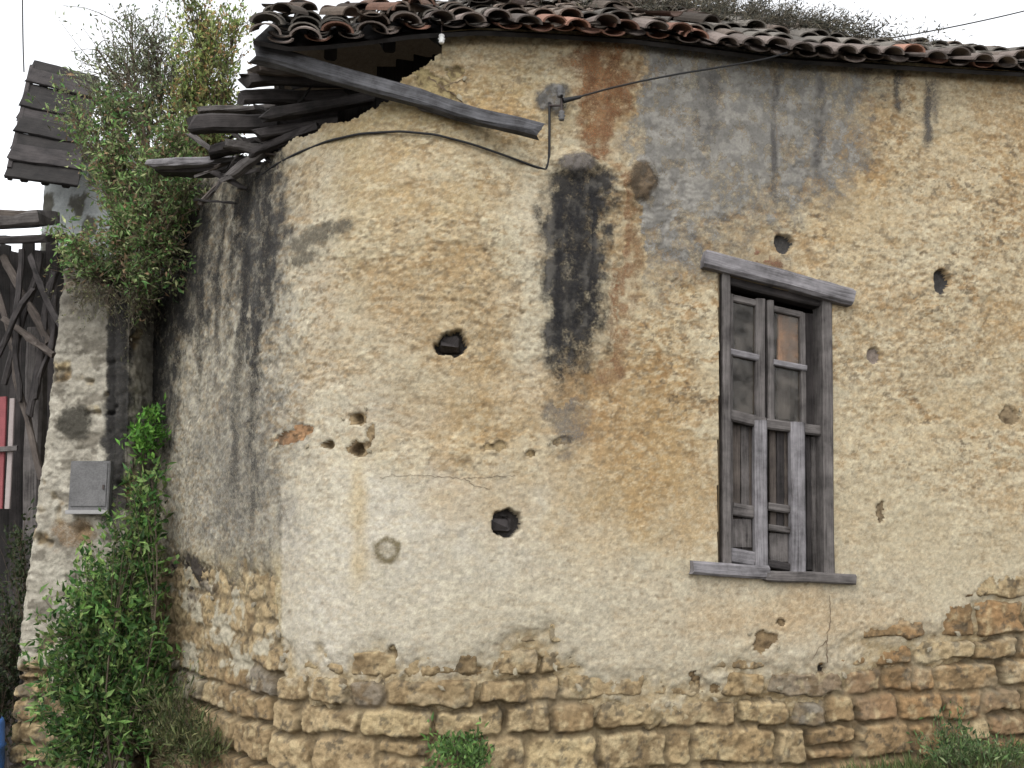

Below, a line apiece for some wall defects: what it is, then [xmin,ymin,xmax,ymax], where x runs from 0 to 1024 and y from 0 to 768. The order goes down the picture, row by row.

corrosion [562,31,641,159]
leakage [922,79,939,142]
leakage [622,36,883,276]
leakage [534,164,621,380]
spalling [933,271,949,295]
leakage [152,151,353,590]
spalling [435,332,467,358]
spalling [273,406,375,457]
crack [386,474,515,490]
spalling [491,509,520,537]
spalling [748,619,785,655]
crack [812,595,831,663]